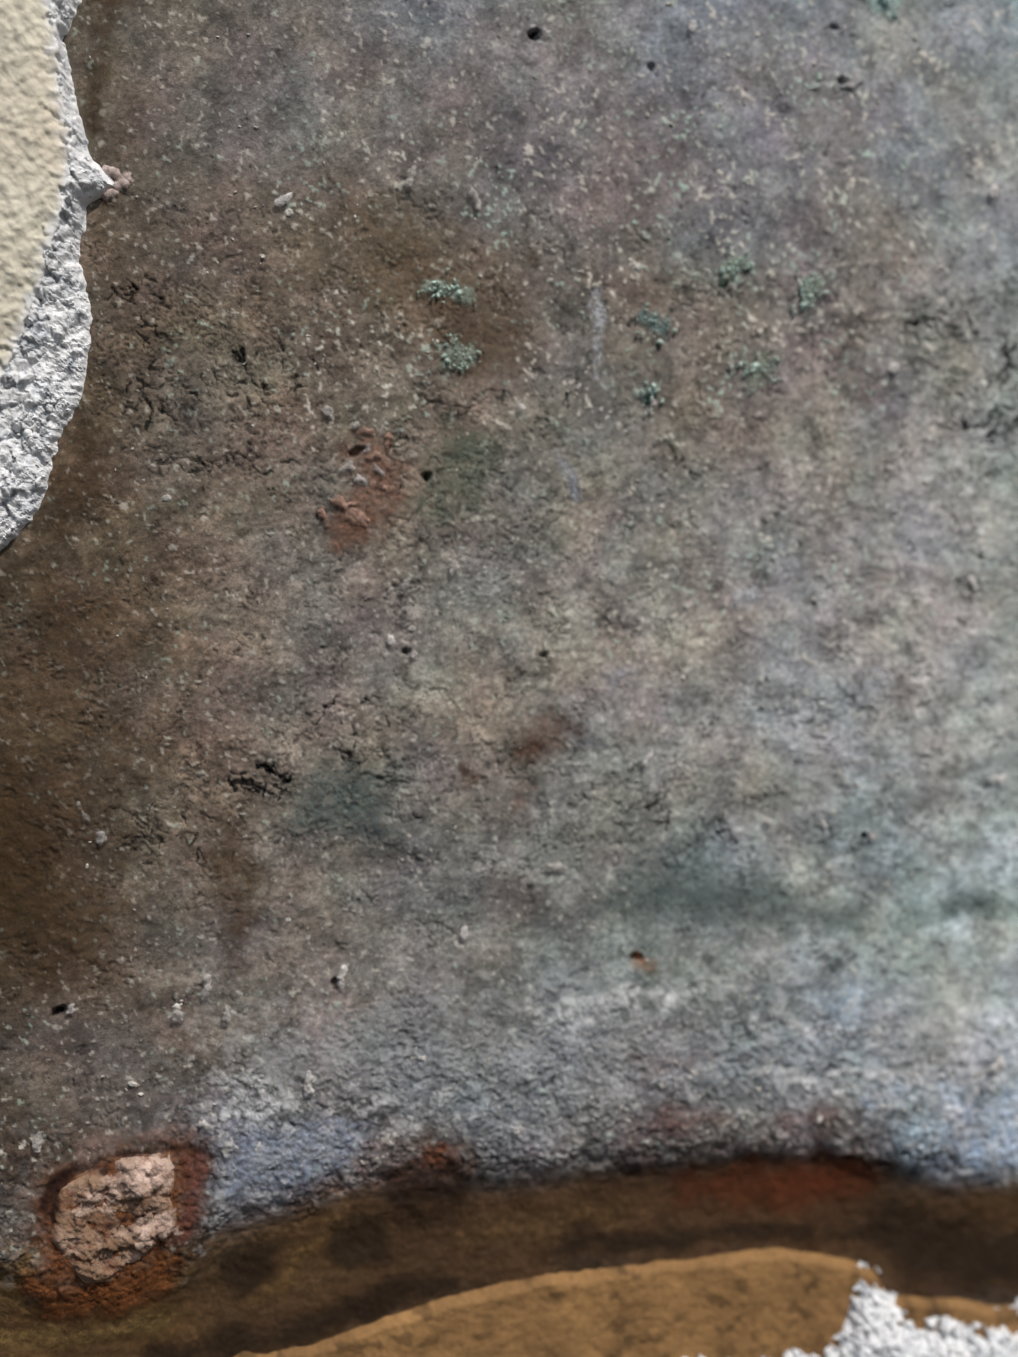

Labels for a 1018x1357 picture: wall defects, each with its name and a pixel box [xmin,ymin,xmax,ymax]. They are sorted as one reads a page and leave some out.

spalling [0,0,134,551]
crack [903,309,1018,446]
rust [21,1122,213,1319]
peeling [72,1162,164,1217]
peeling [135,1209,183,1251]
leakage [0,1150,1018,1357]
spalling [783,1261,1018,1357]
leakage [959,1094,1018,1169]